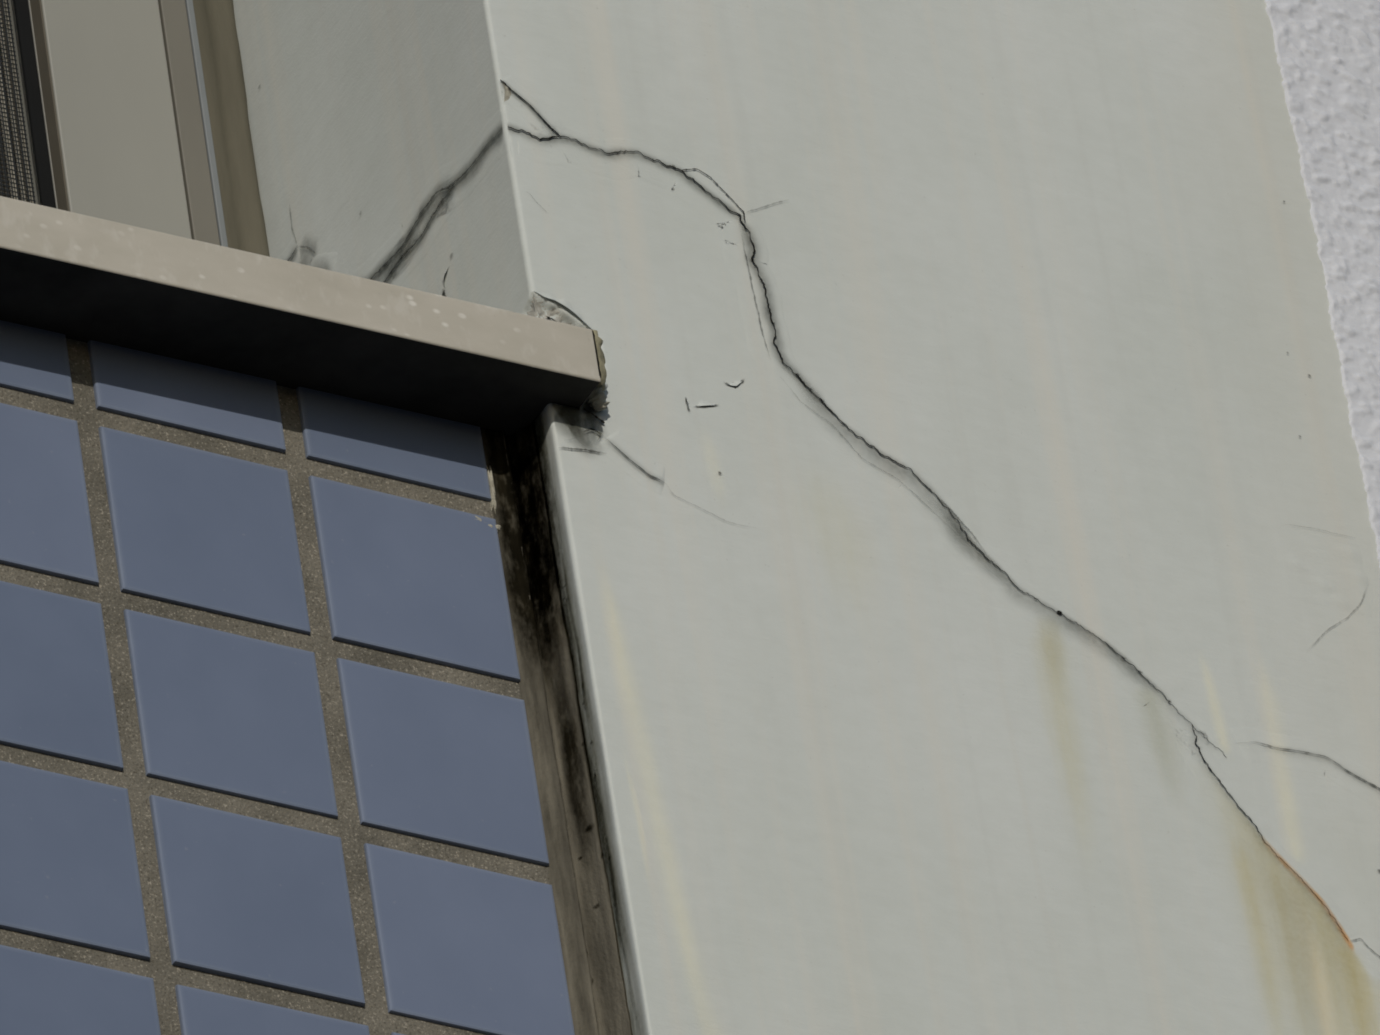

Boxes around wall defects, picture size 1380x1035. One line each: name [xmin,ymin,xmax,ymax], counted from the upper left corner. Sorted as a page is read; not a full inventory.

leakage [484,413,627,1004]
spalling [527,291,593,330]
crack [277,75,1380,957]